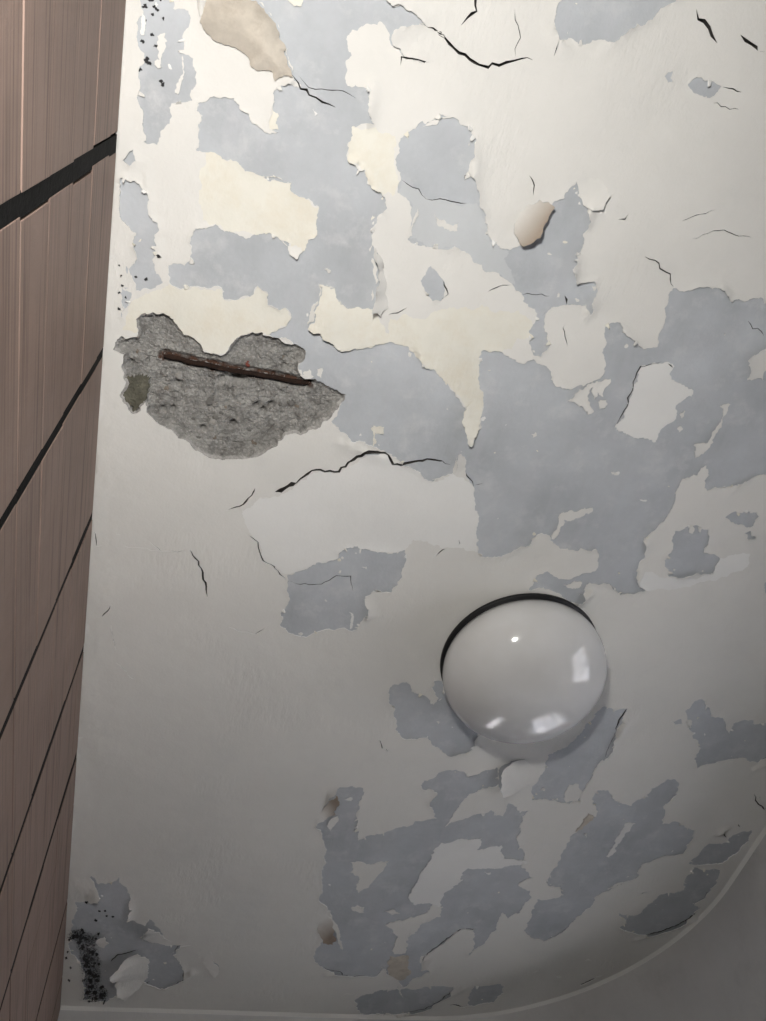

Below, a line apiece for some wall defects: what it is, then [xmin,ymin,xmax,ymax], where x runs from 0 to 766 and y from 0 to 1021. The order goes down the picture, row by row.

crack [428,0,557,69]
crack [696,11,717,43]
crack [741,36,761,52]
crack [292,75,355,107]
peeling [113,0,766,604]
crack [231,450,479,509]
peeling [280,546,407,637]
peeling [389,681,478,757]
peeling [674,699,766,768]
peeling [312,706,752,1016]
damp [65,910,114,1005]
peeling [68,876,184,1002]